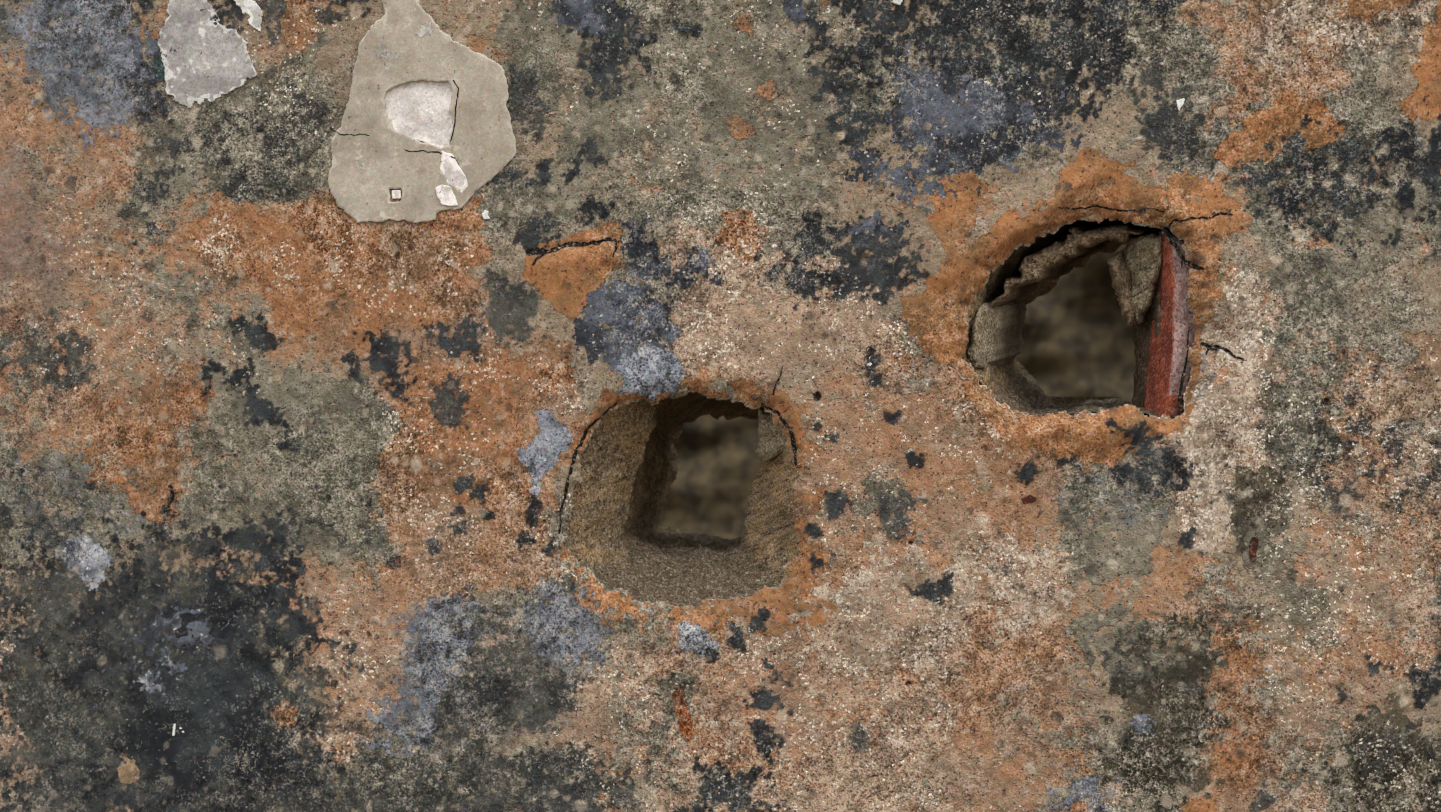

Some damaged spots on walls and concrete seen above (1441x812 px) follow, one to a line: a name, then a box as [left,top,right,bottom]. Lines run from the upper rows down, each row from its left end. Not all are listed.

peeling [157,0,321,108]
peeling [181,81,580,523]
peeling [522,220,624,319]
leakage [672,21,707,37]
leakage [748,0,1441,318]
spalling [900,0,1441,557]
leakage [0,432,616,812]
spalling [560,366,1095,697]
leakage [1364,650,1441,709]